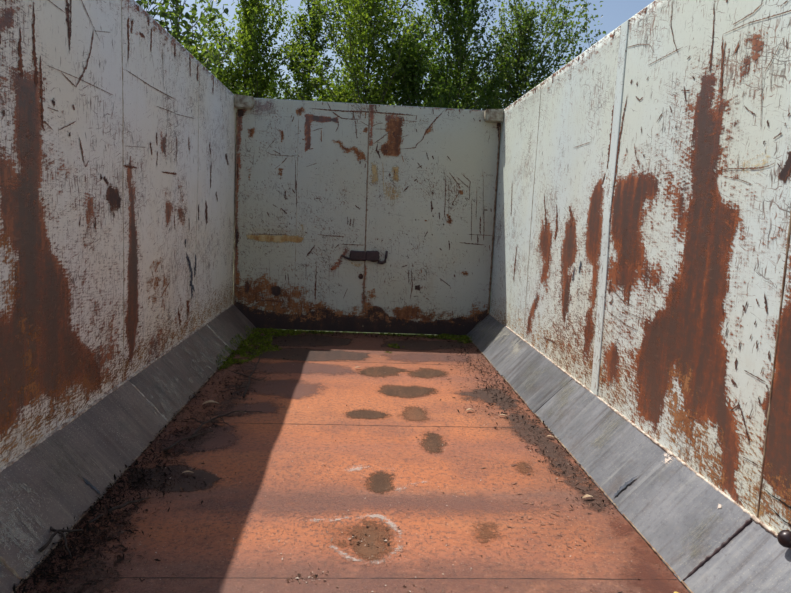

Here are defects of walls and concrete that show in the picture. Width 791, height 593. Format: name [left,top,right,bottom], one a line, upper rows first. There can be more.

rust [0,0,621,462]
rust [598,5,791,533]